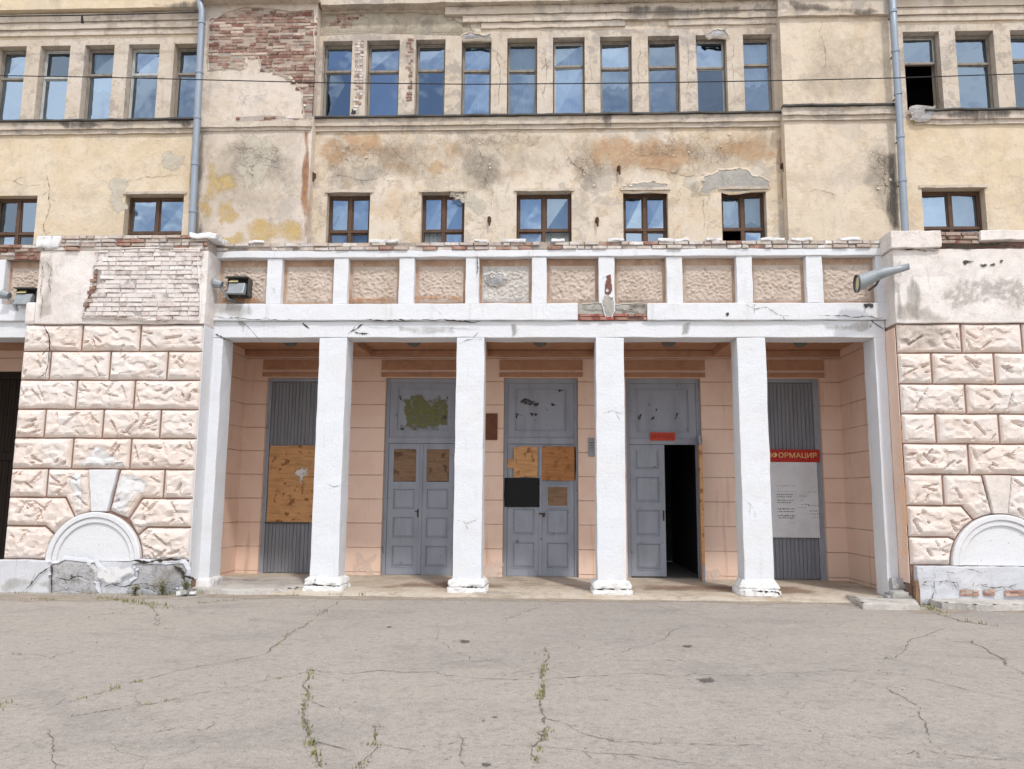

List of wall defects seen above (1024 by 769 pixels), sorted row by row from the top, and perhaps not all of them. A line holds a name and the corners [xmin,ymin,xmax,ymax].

flaking render [207,6,493,189]
flaking render [620,179,670,194]
flaking render [636,132,772,196]
damp [887,157,897,227]
flaking render [82,247,203,323]
flaking render [578,273,647,321]
crack [26,558,339,592]